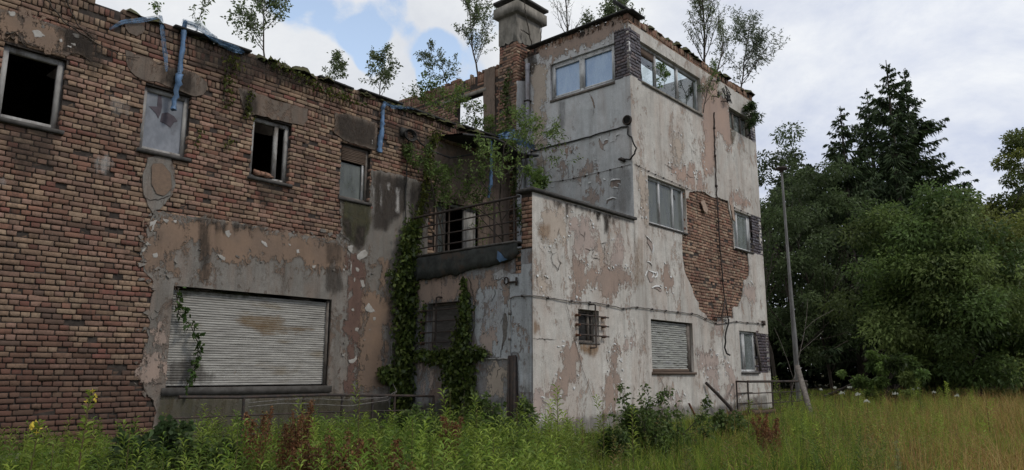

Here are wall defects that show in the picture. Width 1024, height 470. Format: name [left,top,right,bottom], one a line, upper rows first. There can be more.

damp [200,221,261,277]
damp [343,172,431,248]
flaking render [530,16,757,322]
peeling [133,214,397,399]
peeling [414,269,530,401]
peeling [533,335,583,421]
peeling [600,335,636,422]